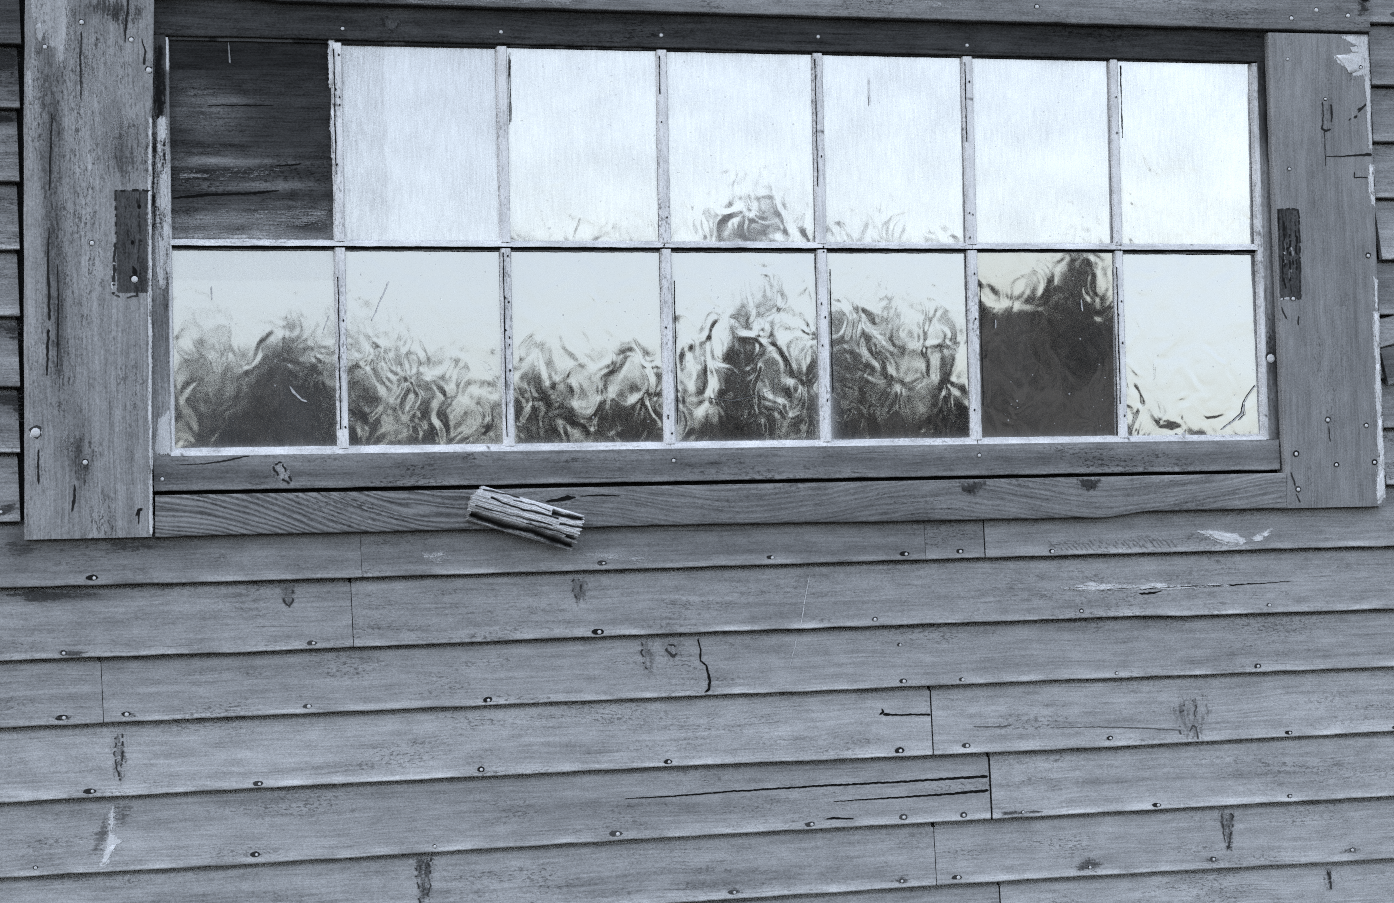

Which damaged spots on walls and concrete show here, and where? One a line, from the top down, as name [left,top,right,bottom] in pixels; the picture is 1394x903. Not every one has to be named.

peeling [1334,35,1375,206]
peeling [1372,276,1386,503]
peeling [1197,529,1272,545]
crack [1139,581,1290,595]
crack [698,639,711,693]
crack [625,775,989,819]
peeling [99,805,122,868]